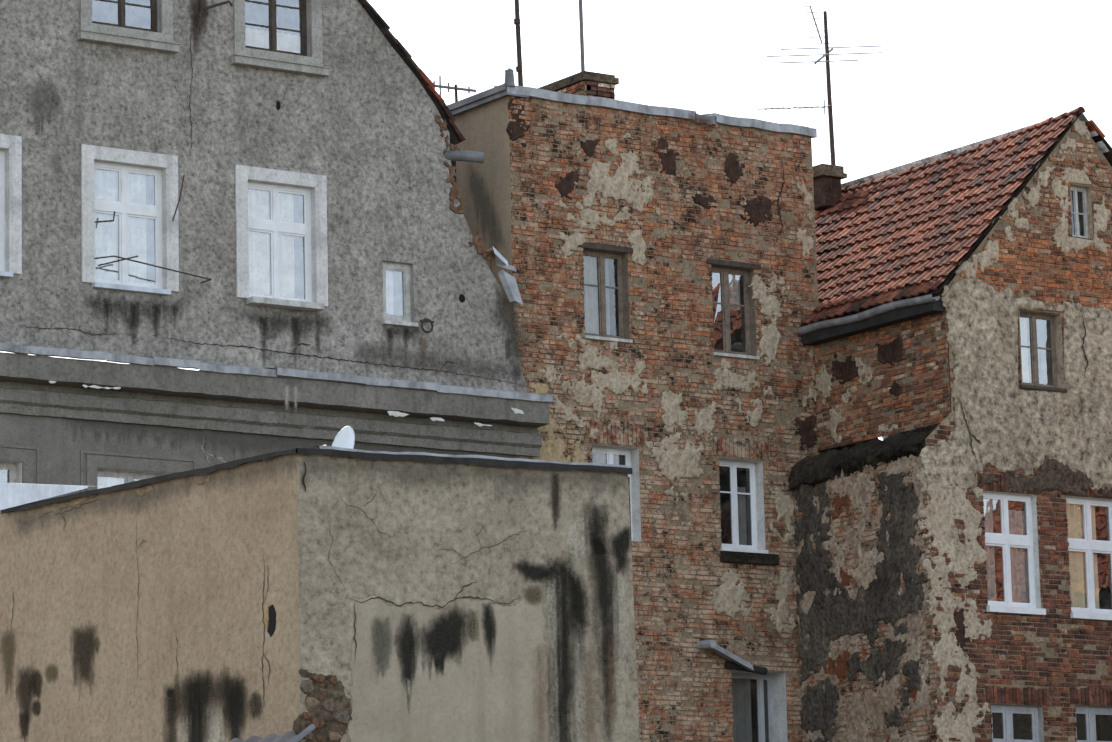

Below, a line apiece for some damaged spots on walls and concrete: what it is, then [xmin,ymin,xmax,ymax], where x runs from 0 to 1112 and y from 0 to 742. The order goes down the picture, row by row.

peeling [999,116,1091,250]
peeling [660,390,717,436]
spalling [795,335,906,450]
damp [3,634,57,741]
damp [73,628,99,680]
damp [165,674,261,742]
crack [261,551,270,719]
spalling [293,669,352,742]
crack [328,494,534,663]
damp [373,604,496,695]
damp [517,475,630,742]
flaking render [769,472,928,742]